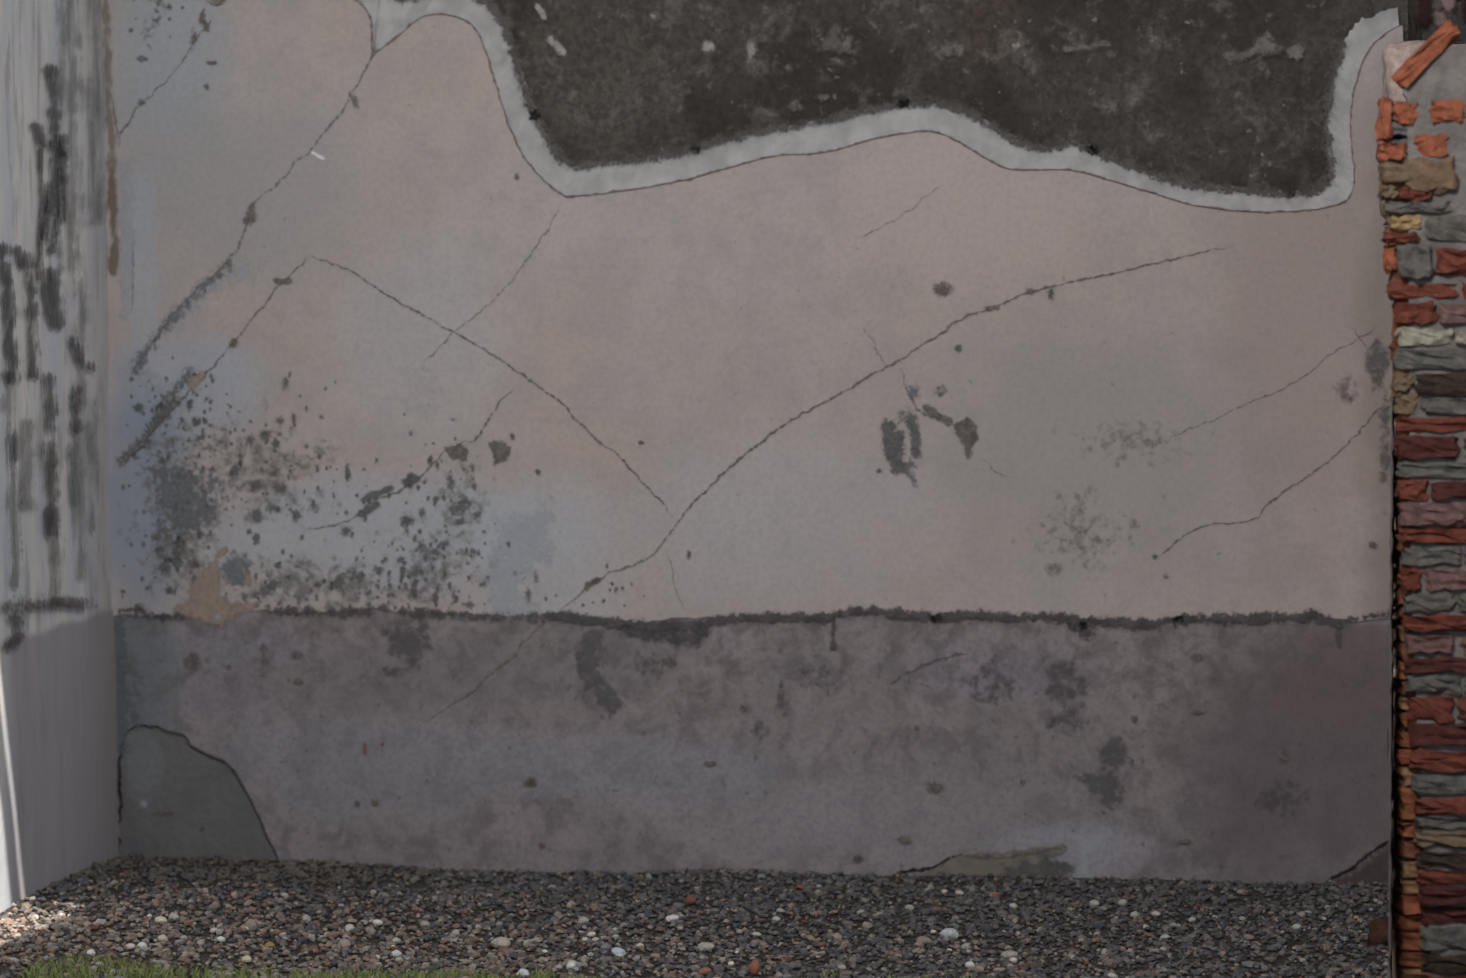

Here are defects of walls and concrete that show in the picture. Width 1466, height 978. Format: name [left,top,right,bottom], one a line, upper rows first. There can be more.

leakage [129,0,184,62]
crack [118,9,211,148]
flaking render [491,0,1408,212]
leakage [0,0,134,609]
spalling [174,547,259,627]
leakage [122,372,510,676]
crack [117,38,1233,725]
leakage [877,386,921,486]
crack [1153,404,1386,579]
leakage [575,629,622,718]
spalling [117,724,279,861]